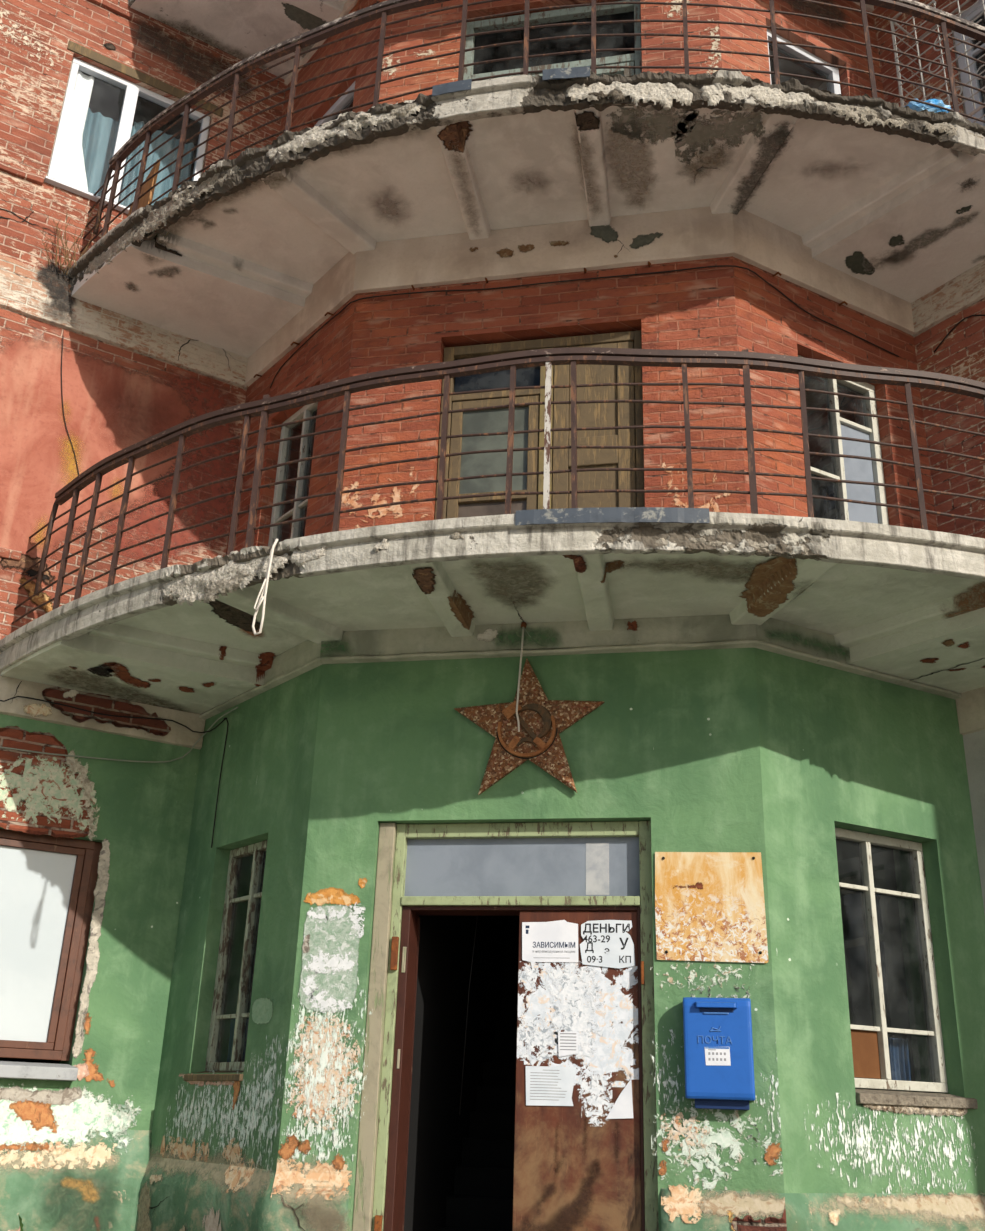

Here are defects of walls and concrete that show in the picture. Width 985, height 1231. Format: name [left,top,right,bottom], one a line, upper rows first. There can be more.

water stain [786,0,844,26]
spalling [266,100,426,159]
spalling [566,19,984,139]
spalling [84,165,240,274]
rust [945,581,985,618]
rust [920,639,985,672]
flaking render [23,687,171,736]
flaking render [0,726,110,1058]
peeling [0,1084,142,1172]
peeling [137,977,372,1231]
peeling [651,1030,787,1231]
peeling [804,1093,985,1227]